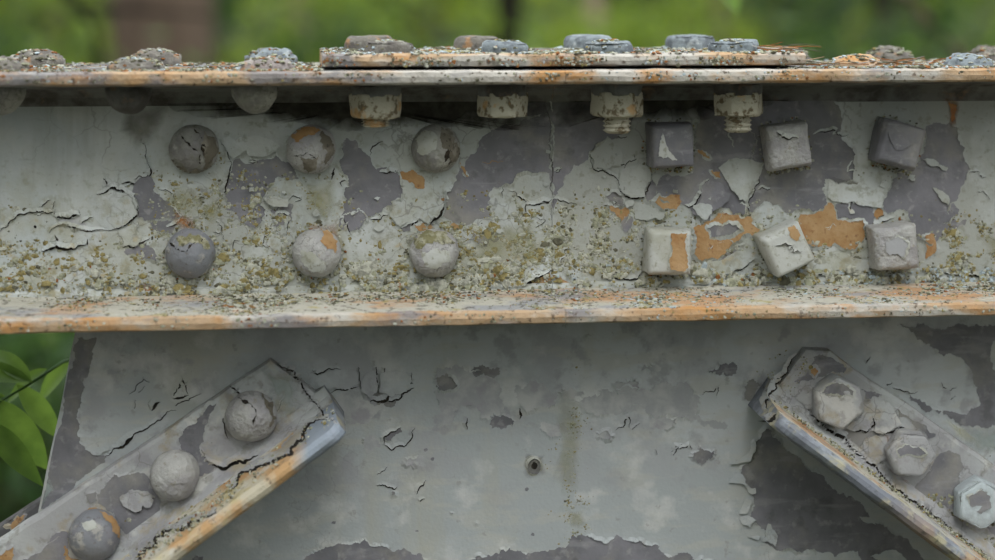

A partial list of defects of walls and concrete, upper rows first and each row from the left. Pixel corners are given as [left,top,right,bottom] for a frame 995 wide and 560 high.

crack [0,129,302,252]
crack [339,201,445,235]
peeling [172,101,633,248]
corrosion [668,213,760,273]
peeling [605,101,972,276]
corrosion [786,203,883,253]
crack [104,375,202,457]
corrosion [3,513,27,530]
corrosion [85,507,120,539]
crack [124,360,414,560]
peeling [467,533,714,560]
peeling [738,424,924,560]